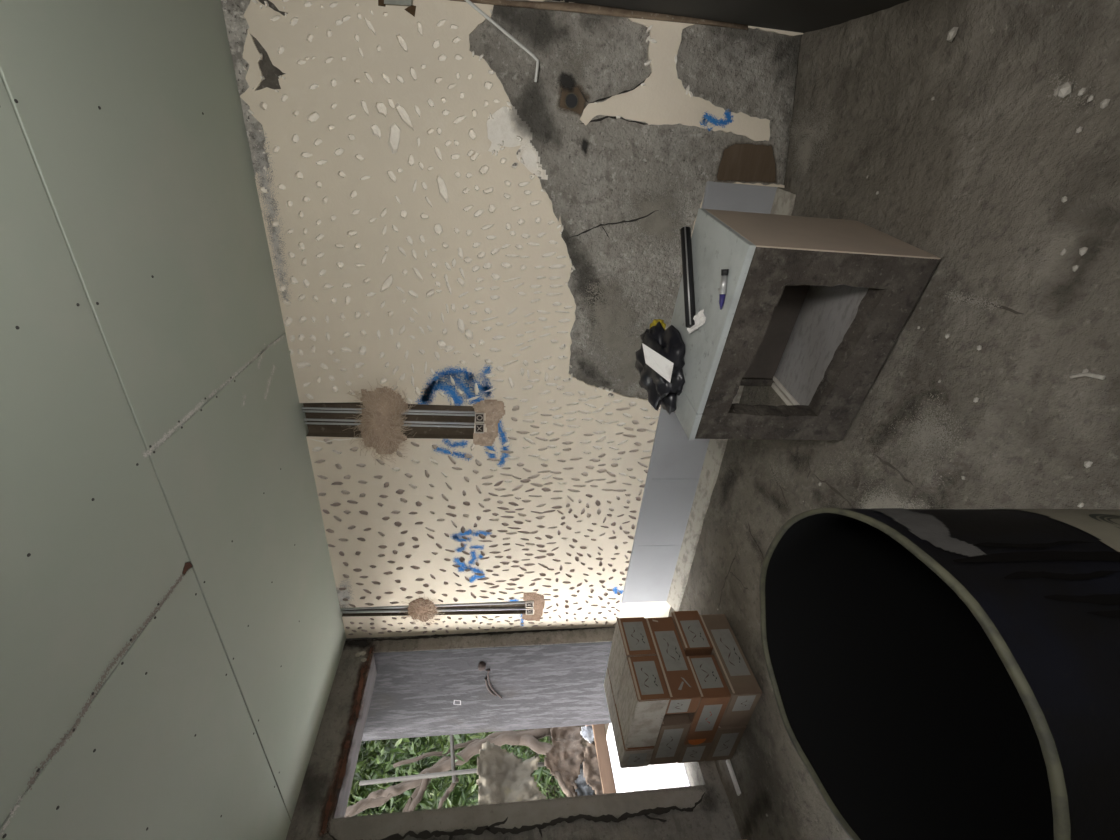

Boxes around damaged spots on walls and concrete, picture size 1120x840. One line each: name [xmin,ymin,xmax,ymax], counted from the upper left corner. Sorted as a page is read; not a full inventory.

crack [569,210,659,239]
spalling [221,0,796,635]
crack [327,793,705,840]